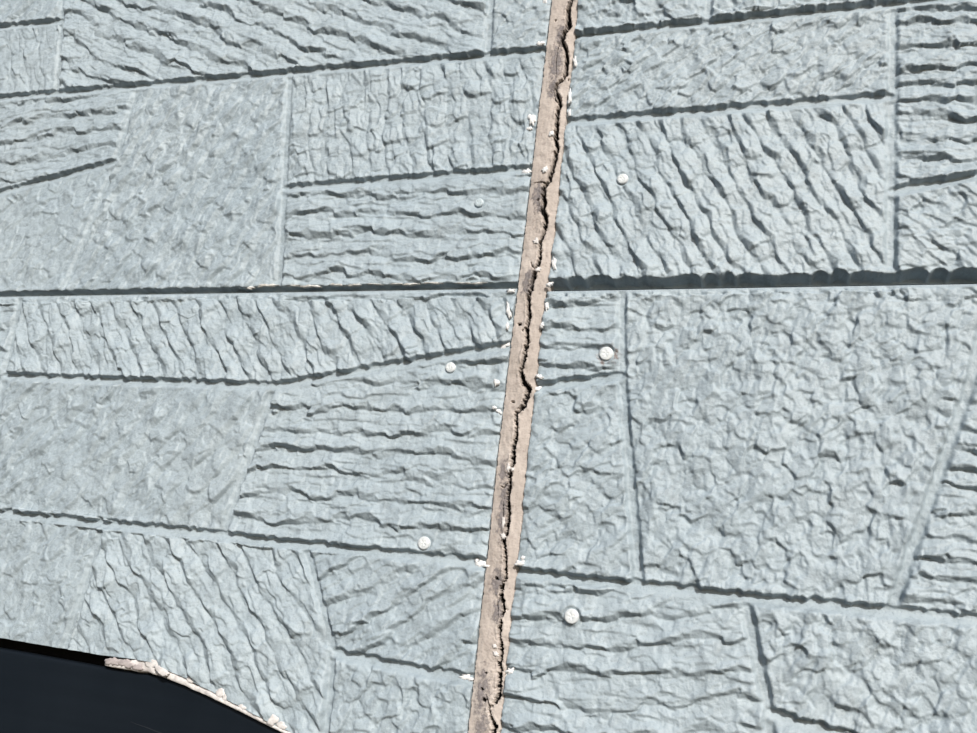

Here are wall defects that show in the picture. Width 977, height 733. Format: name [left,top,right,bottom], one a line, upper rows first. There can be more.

crack [481,0,574,733]